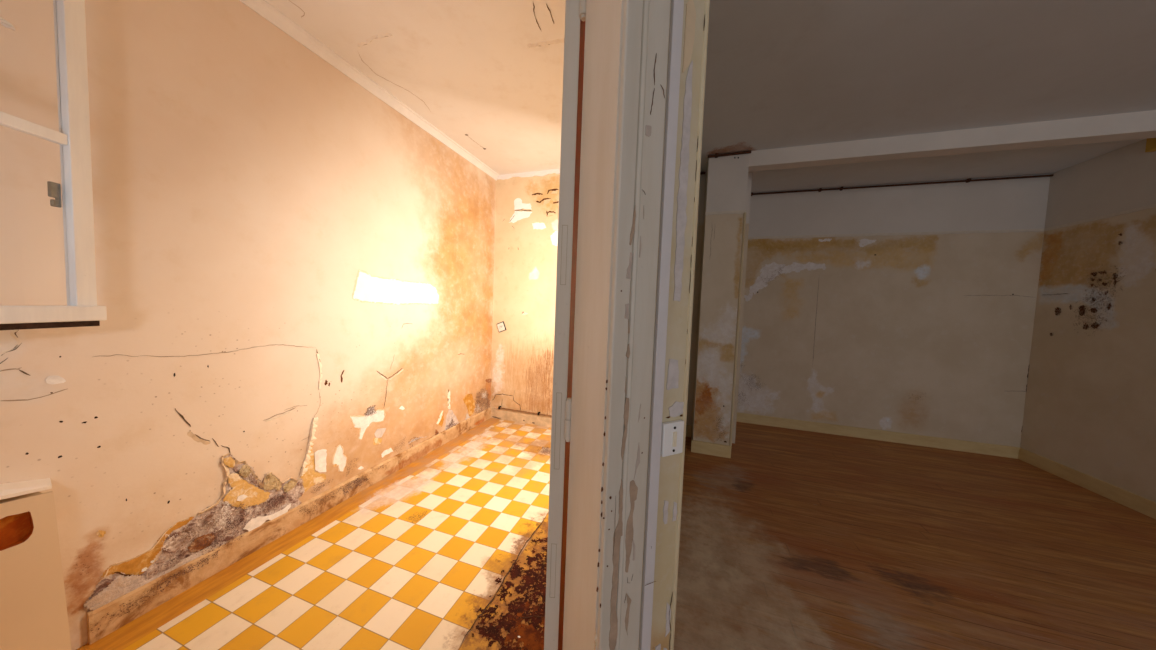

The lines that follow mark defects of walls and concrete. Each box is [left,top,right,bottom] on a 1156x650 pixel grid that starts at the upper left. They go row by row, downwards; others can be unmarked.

crack [527,3,564,47]
flaking render [510,198,558,246]
flaking render [352,270,440,305]
leakage [255,81,555,523]
leakage [696,214,946,444]
crack [0,359,66,401]
crack [94,344,323,477]
peeling [349,405,393,458]
spalling [408,390,475,447]
spalling [84,445,364,612]
leakage [90,550,219,633]